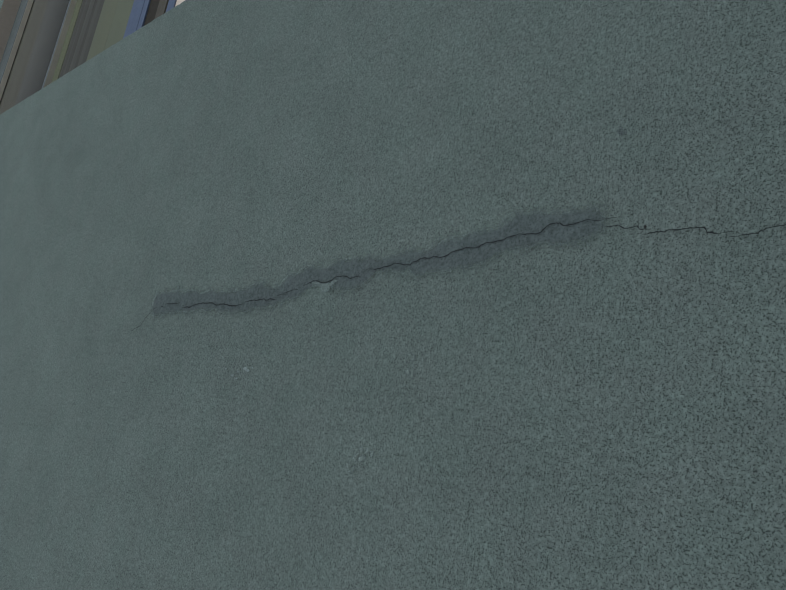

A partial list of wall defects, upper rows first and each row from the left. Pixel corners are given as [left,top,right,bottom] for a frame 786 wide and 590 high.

damp [152,207,604,315]
crack [132,217,786,331]